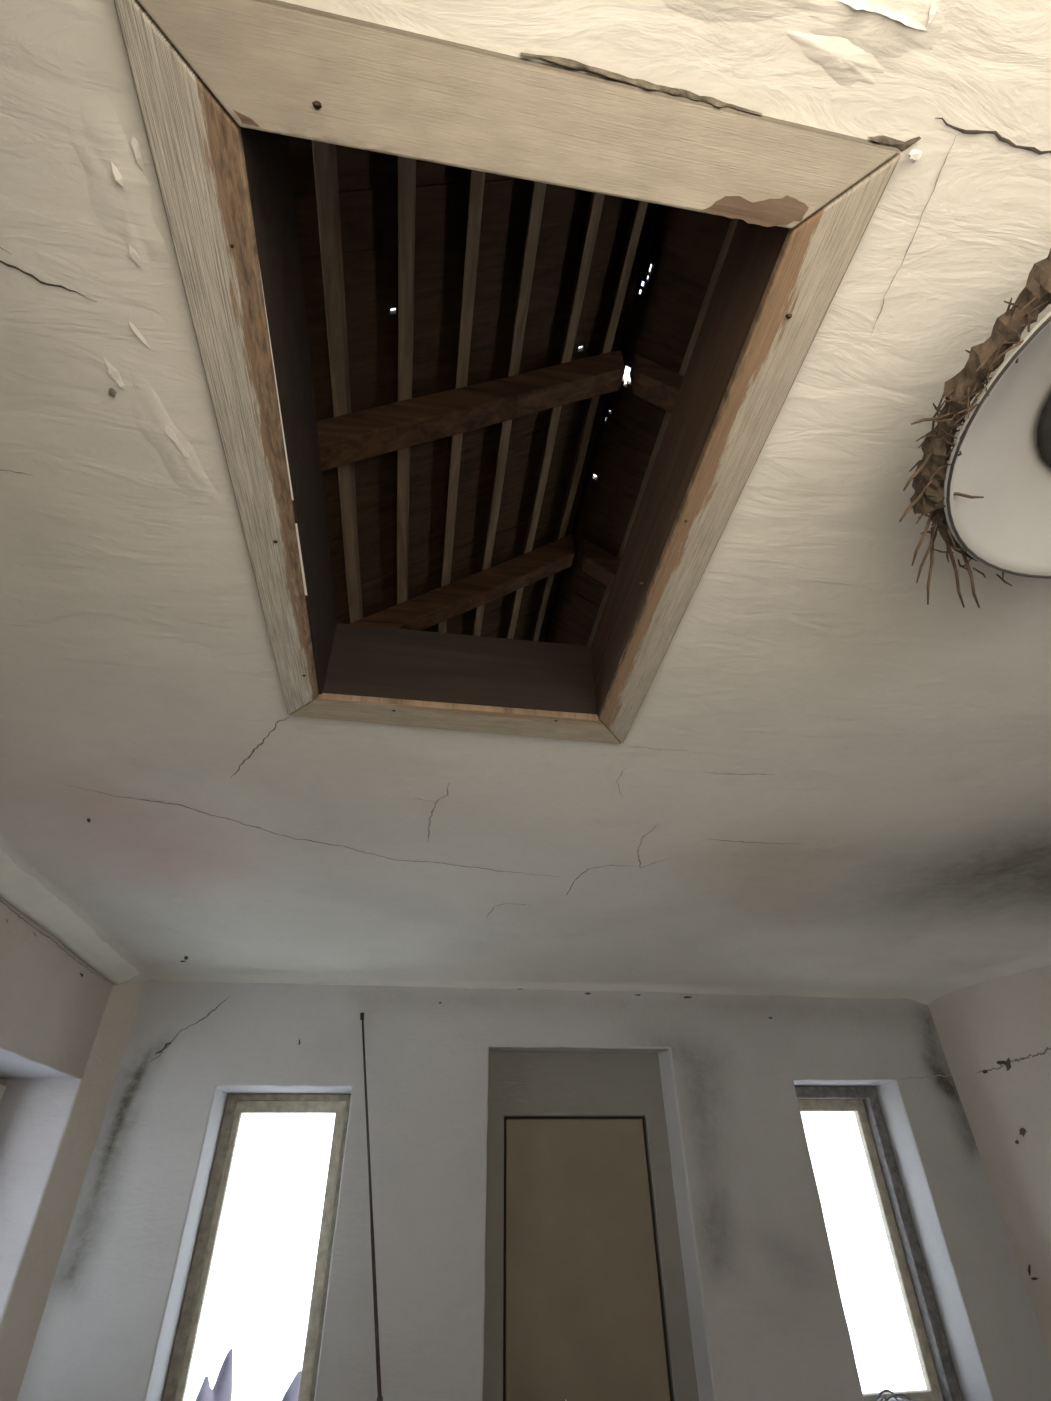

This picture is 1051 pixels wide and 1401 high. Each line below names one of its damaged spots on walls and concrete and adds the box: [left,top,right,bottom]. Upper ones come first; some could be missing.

flaking render [836,0,941,31]
crack [873,118,1051,330]
crack [0,247,97,302]
crack [230,716,291,779]
crack [68,784,669,918]
leakage [328,780,1051,1177]
crack [143,995,230,1066]
crack [903,1047,1051,1079]
leakage [41,1018,190,1321]